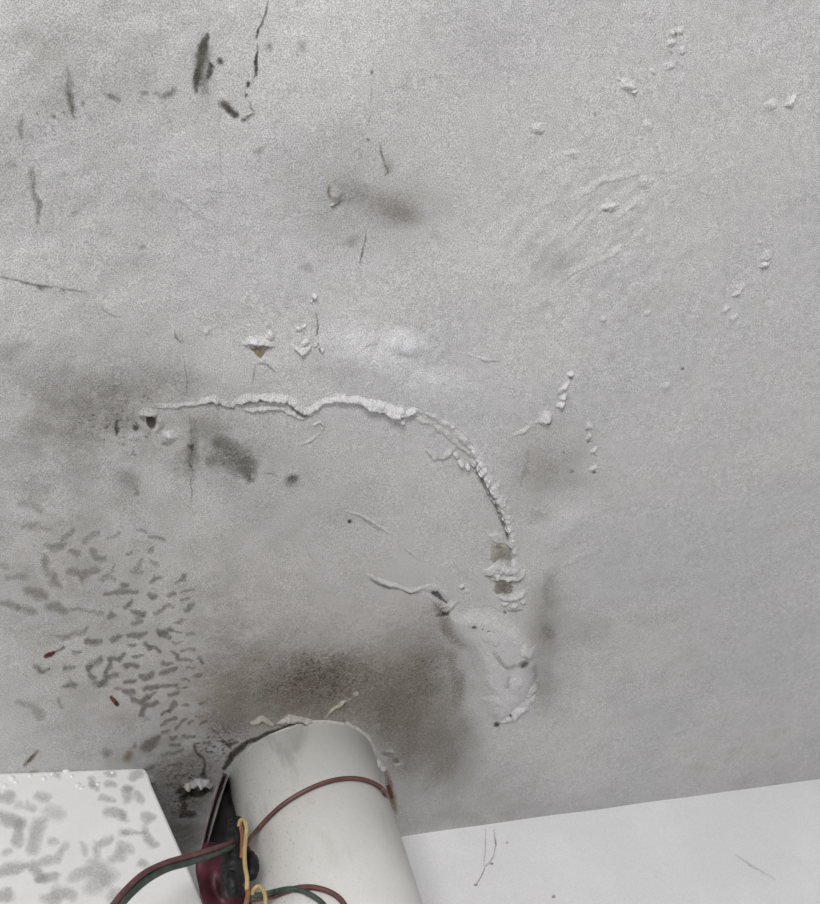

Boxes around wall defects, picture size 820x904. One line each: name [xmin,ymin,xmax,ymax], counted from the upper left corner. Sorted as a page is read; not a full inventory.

spalling [241,303,281,375]
crack [366,574,432,593]
water stain [86,583,232,807]
water stain [0,813,42,851]
water stain [0,860,58,882]